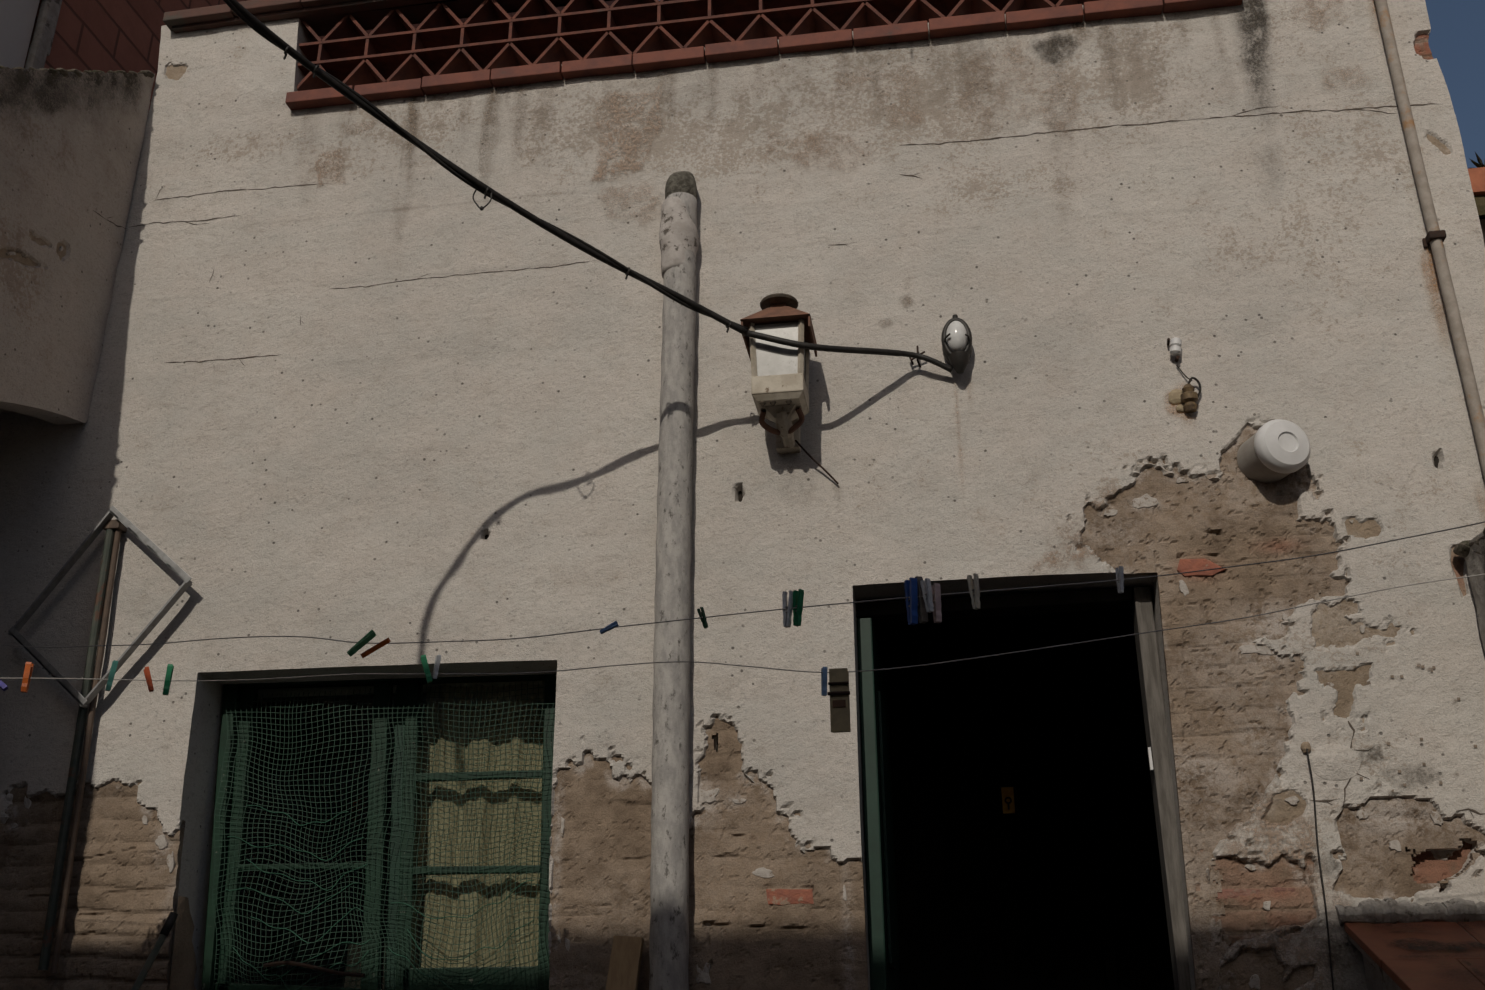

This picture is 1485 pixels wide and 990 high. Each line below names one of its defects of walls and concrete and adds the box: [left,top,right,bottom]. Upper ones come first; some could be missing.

crack [93,183,321,229]
crack [899,103,1434,179]
water stain [1242,0,1266,84]
spalling [1038,425,1414,990]
spalling [0,781,197,990]
spalling [549,752,652,990]
spalling [688,716,869,990]
spalling [1332,770,1485,902]